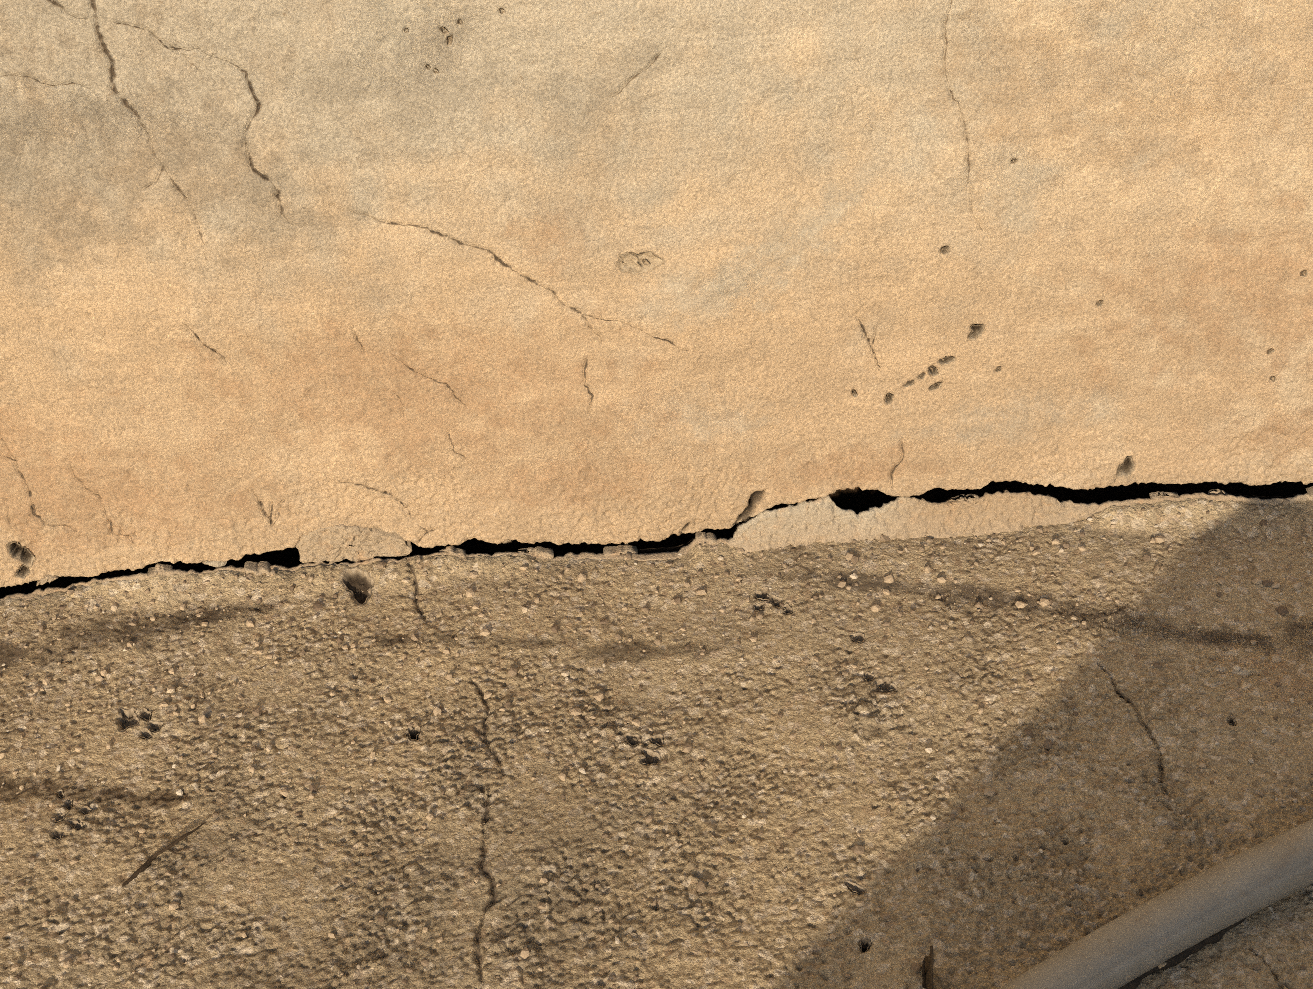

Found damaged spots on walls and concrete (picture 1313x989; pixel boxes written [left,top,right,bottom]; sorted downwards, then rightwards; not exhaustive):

crack [4,0,204,244]
crack [229,62,288,221]
crack [944,0,982,230]
crack [394,360,466,459]
crack [358,213,686,402]
crack [859,321,881,369]
crack [0,438,1313,619]
crack [474,684,504,982]